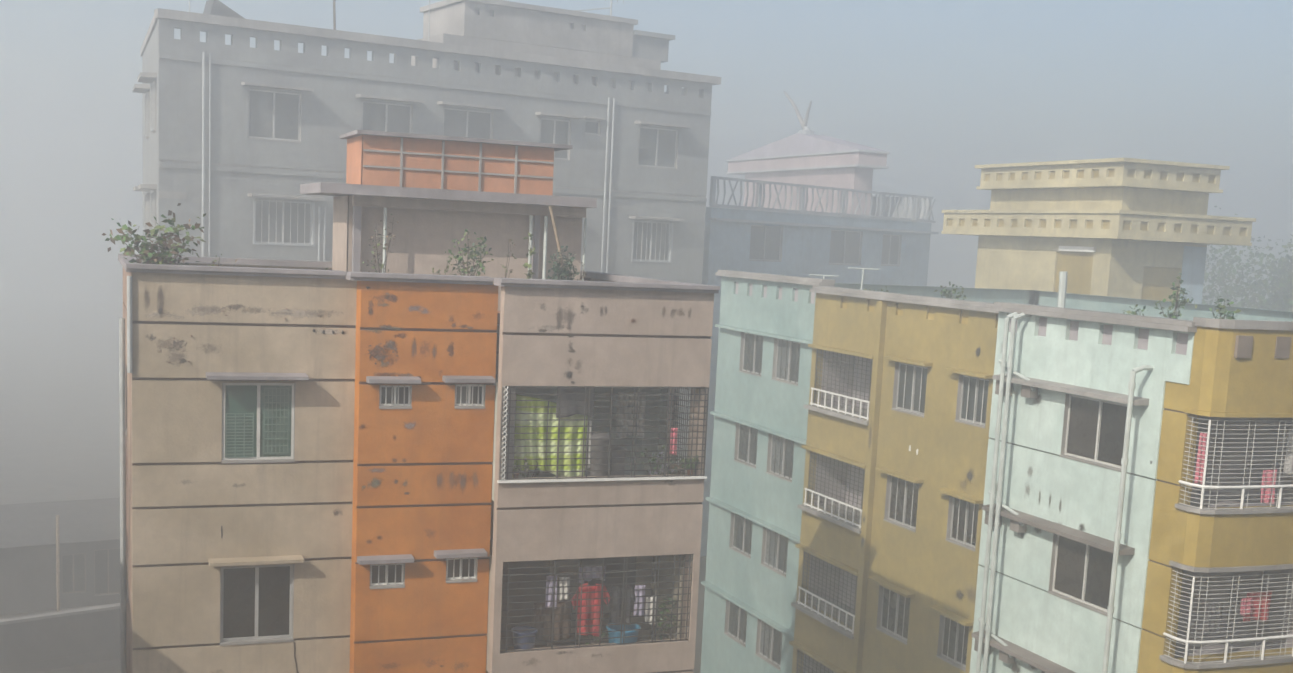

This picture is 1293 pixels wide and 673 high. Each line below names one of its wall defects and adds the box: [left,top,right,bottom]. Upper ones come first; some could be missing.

peeling [369,340,421,378]